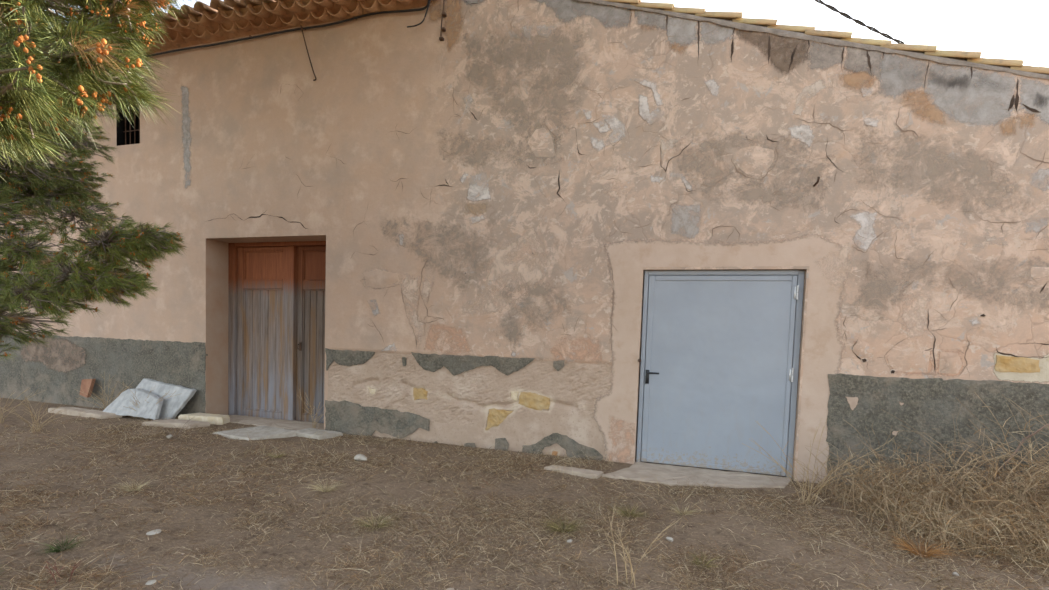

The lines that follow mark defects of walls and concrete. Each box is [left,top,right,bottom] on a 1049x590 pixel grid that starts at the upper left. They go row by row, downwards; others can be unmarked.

crack [697,20,735,62]
crack [766,33,810,72]
crack [841,46,884,90]
crack [979,78,1049,190]
crack [205,156,311,229]
crack [391,148,456,199]
crack [526,62,929,350]
crack [963,197,1049,253]
crack [351,207,446,346]
crack [834,200,979,379]
spalling [325,343,612,461]